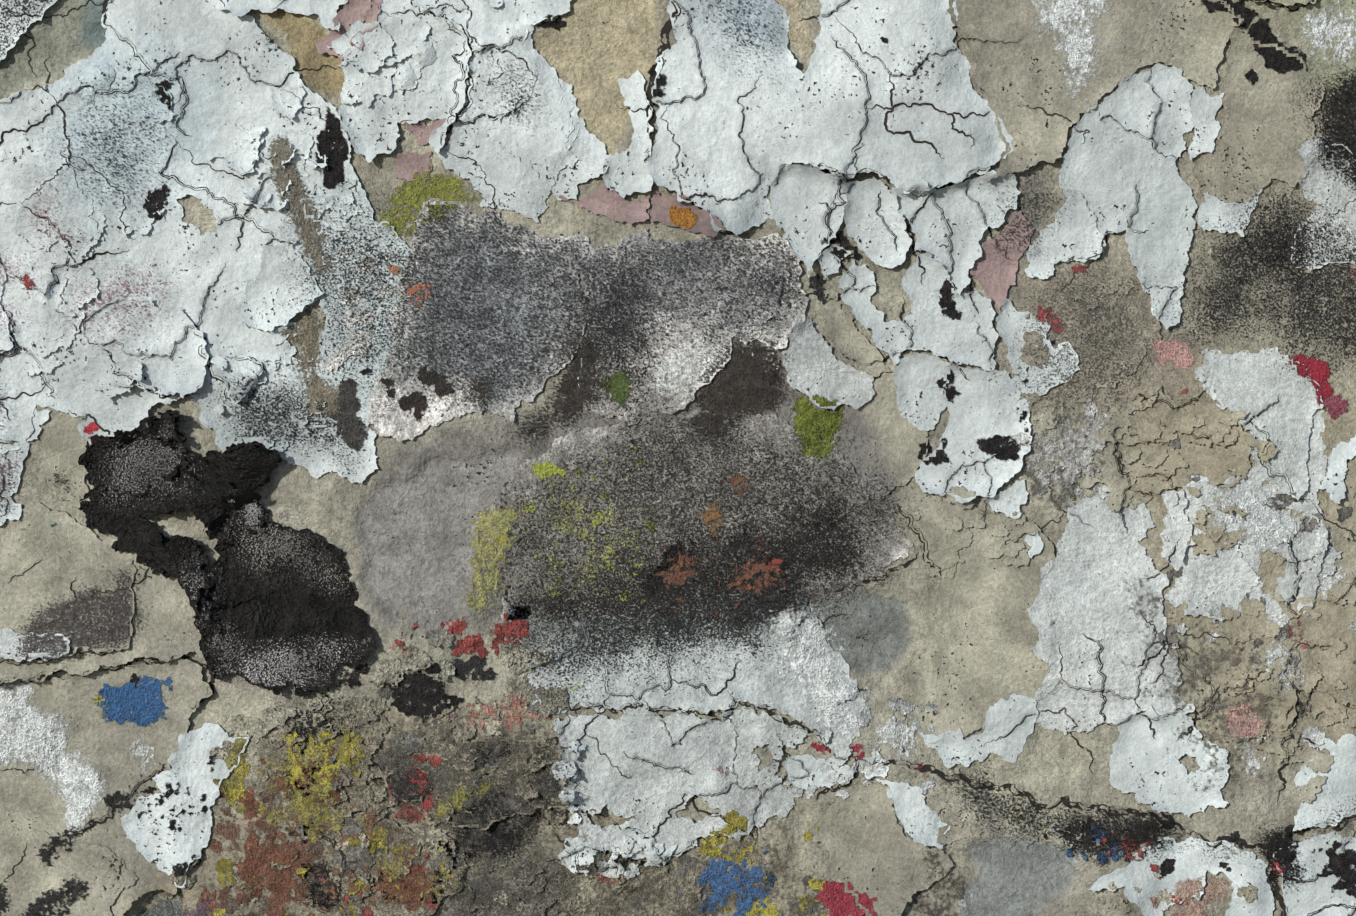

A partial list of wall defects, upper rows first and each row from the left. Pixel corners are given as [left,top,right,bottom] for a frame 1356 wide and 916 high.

crack [1024,61,1195,161]
crack [0,0,359,516]
crack [615,0,1024,380]
crack [1061,187,1149,290]
crack [0,564,215,709]
spalling [367,645,455,687]
crack [506,388,1356,916]
peeling [783,754,855,799]
peeling [1293,733,1356,831]
peeling [598,835,644,879]
peeling [1087,837,1275,916]
peeling [1273,831,1356,916]